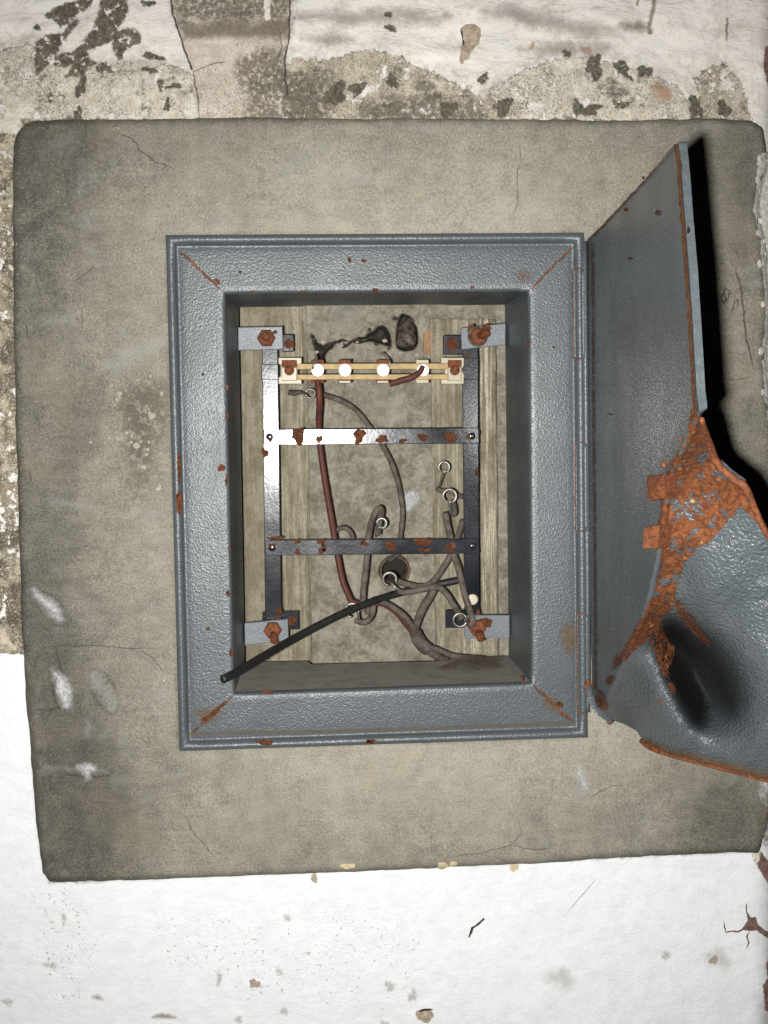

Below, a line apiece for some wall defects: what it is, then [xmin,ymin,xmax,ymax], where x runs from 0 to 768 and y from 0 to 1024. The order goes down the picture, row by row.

water stain [21,0,182,126]
crack [170,0,192,70]
crack [283,0,291,95]
spalling [459,24,481,64]
peeling [282,48,753,121]